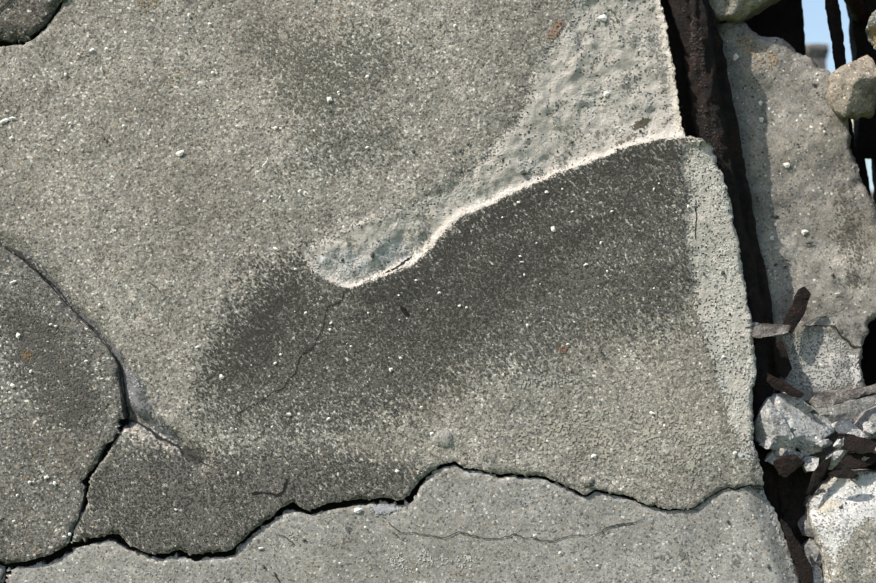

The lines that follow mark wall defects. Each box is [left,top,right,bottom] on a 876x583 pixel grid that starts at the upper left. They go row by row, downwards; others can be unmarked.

crack [0,33,40,47]
crack [385,256,412,273]
spalling [304,0,756,456]
crack [36,270,213,511]
crack [226,291,345,417]
damp [73,137,720,554]
rust [750,286,811,398]
spalling [782,321,863,393]
crack [0,461,701,583]
spalling [760,488,793,577]
spalling [808,471,876,572]